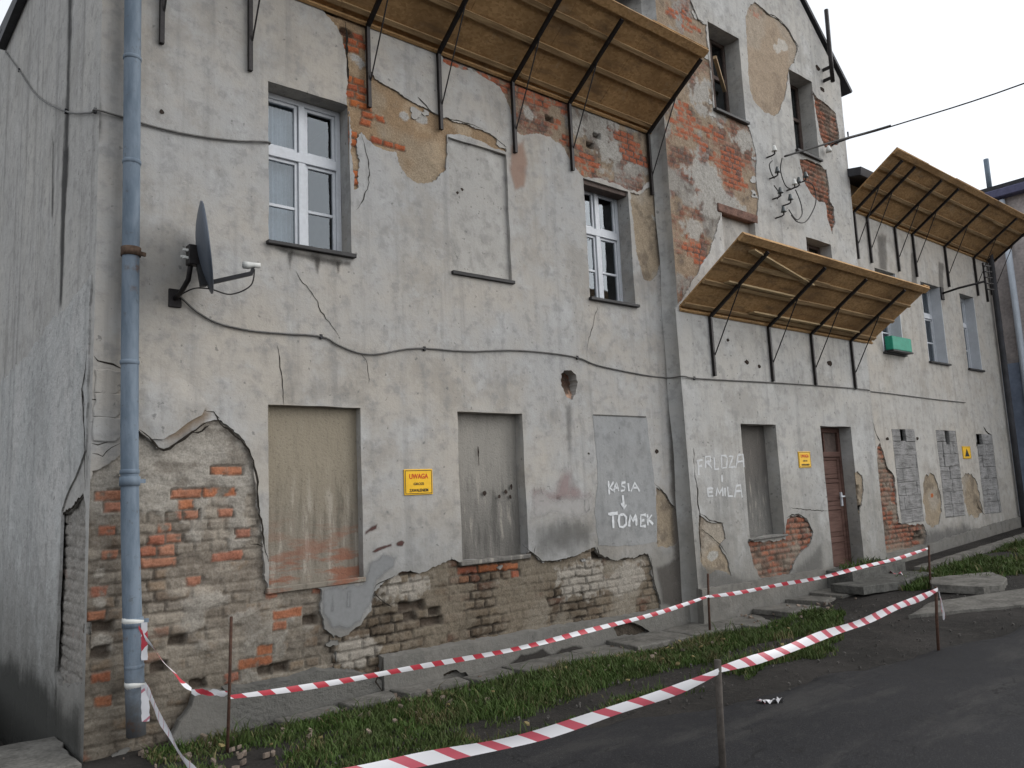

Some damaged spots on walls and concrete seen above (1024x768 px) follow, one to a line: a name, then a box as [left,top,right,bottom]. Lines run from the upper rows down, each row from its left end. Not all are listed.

flaking render [324,11,506,190]
flaking render [442,56,660,281]
flaking render [655,0,758,303]
flaking render [746,3,796,116]
flaking render [800,160,834,231]
crack [297,274,340,338]
spalling [561,372,572,399]
crack [63,350,269,562]
flaking render [59,420,659,762]
flaking render [699,516,730,575]
flaking render [748,515,812,578]
flaking render [877,437,941,553]